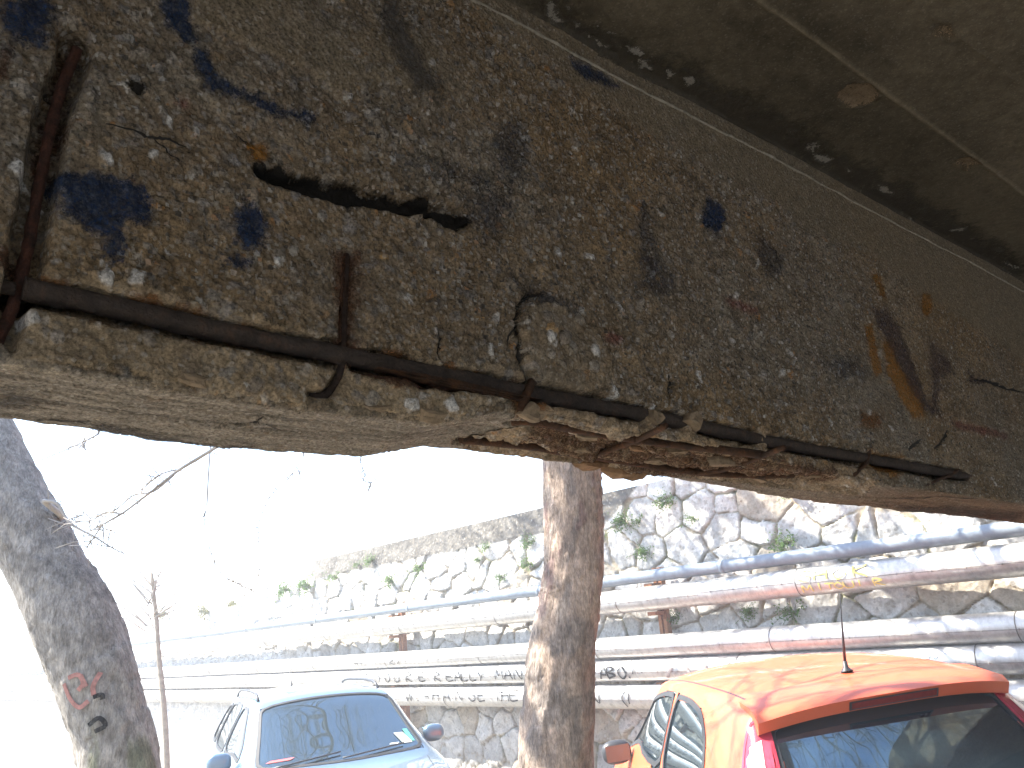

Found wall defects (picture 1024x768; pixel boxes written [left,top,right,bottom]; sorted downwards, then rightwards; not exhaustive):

crack [106,123,185,161]
crack [506,294,536,384]
corrosion [344,362,454,392]
spalling [0,253,972,496]
corrosion [520,427,838,483]